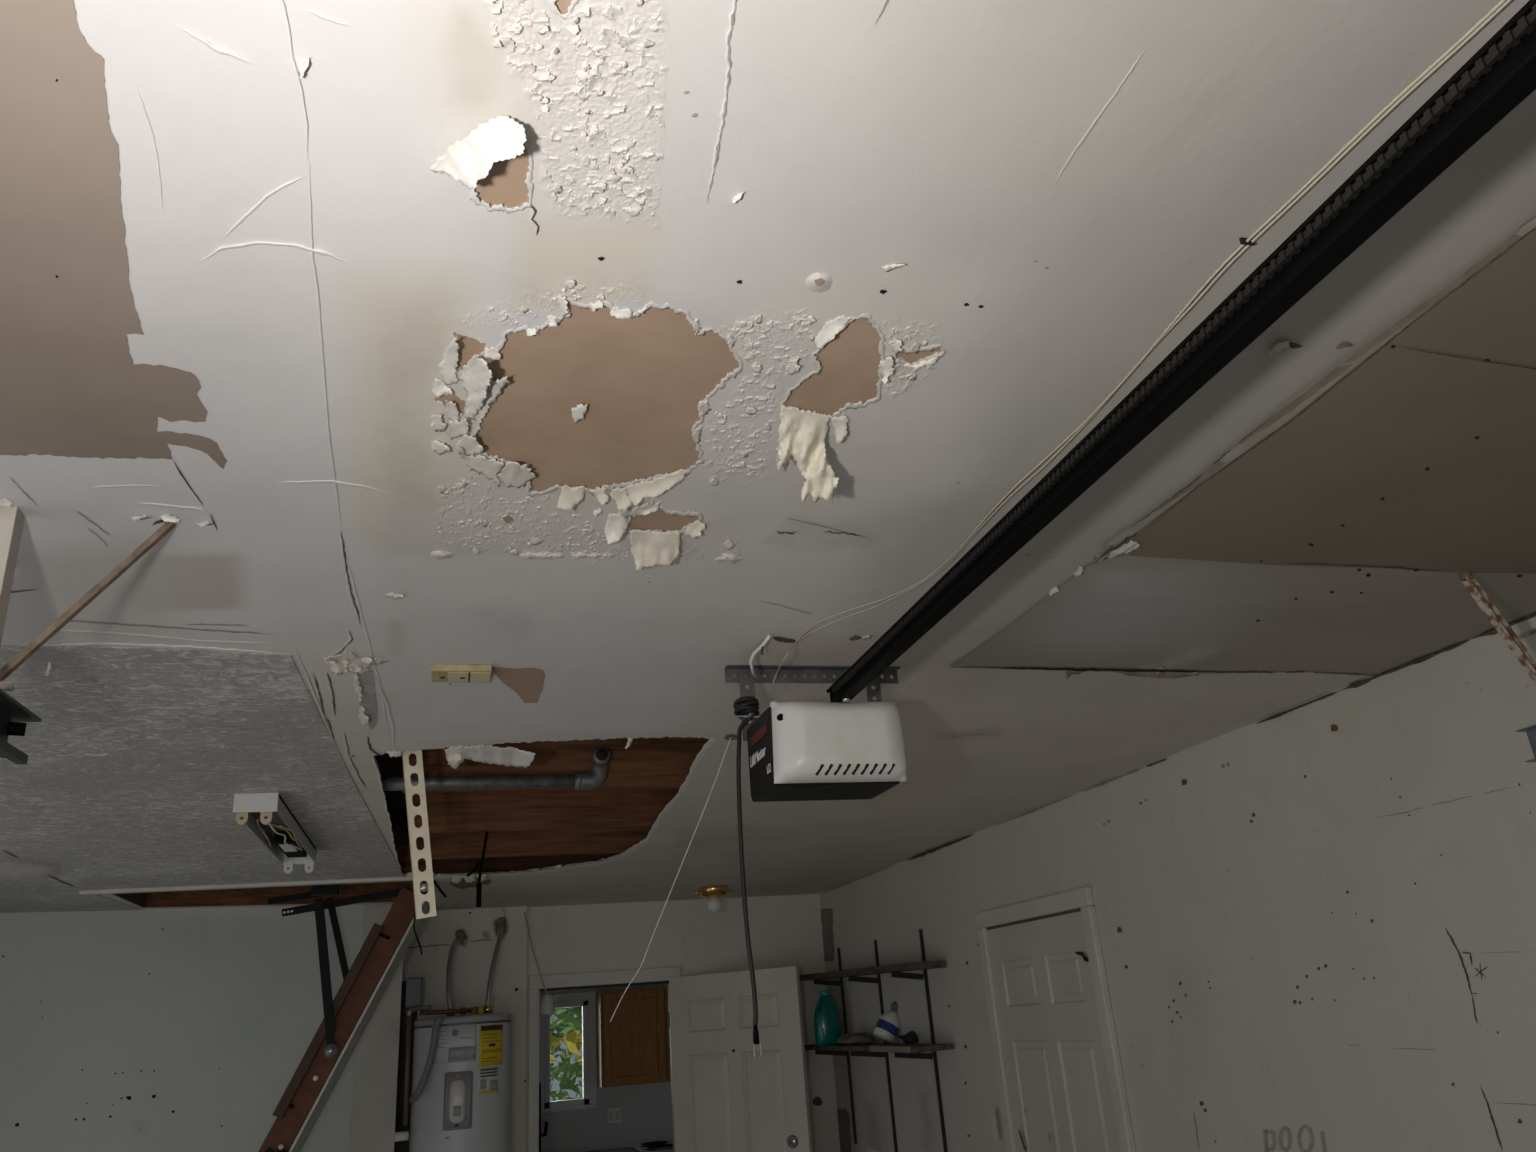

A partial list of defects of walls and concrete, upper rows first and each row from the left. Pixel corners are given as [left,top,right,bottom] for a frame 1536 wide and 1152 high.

peeling [0,0,227,469]
peeling [431,0,674,235]
crack [706,0,737,203]
crack [281,0,384,789]
peeling [424,276,950,570]
peeling [492,667,545,703]
crack [1371,785,1520,819]
crack [1445,928,1532,1024]